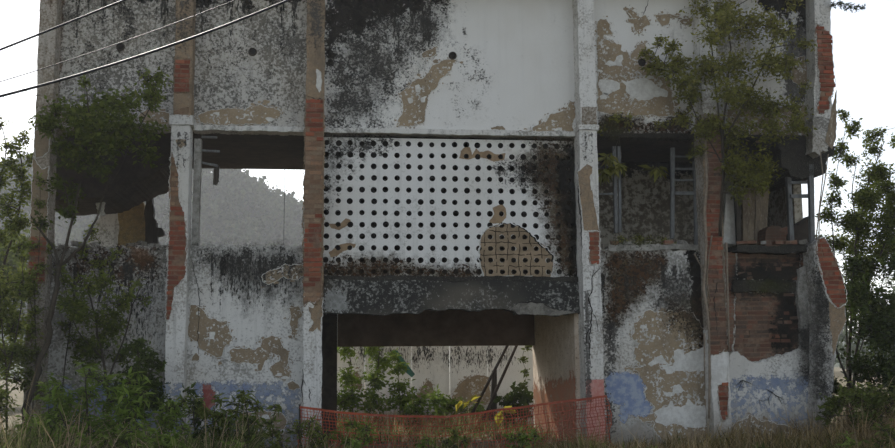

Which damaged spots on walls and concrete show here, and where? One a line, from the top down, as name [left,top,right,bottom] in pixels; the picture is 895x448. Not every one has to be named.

damp [63,0,454,211]
peeling [394,46,489,129]
peeling [518,5,693,139]
flaking render [791,22,837,149]
damp [197,242,304,312]
flaking render [188,69,356,390]
damp [322,254,483,314]
spalling [478,205,555,277]
damp [583,290,593,403]
damp [493,108,694,283]
damp [600,243,703,433]
peeling [624,102,805,444]